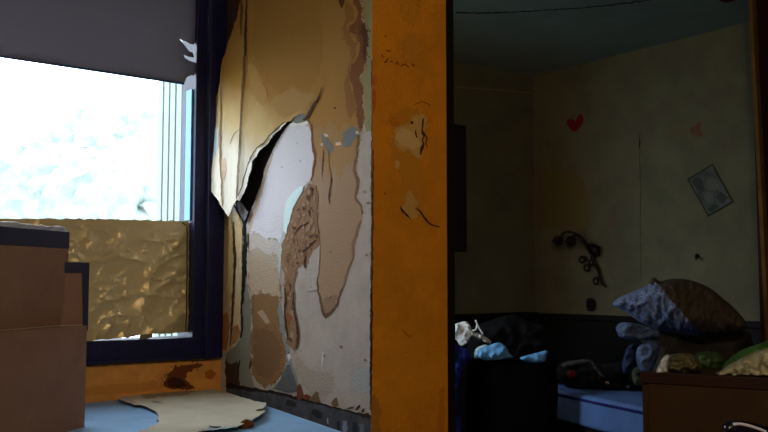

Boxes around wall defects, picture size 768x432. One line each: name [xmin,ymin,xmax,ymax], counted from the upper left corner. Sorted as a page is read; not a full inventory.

crack [414,102,430,155]
crack [400,206,440,227]
peeling [223,60,382,432]
rust [161,361,216,391]